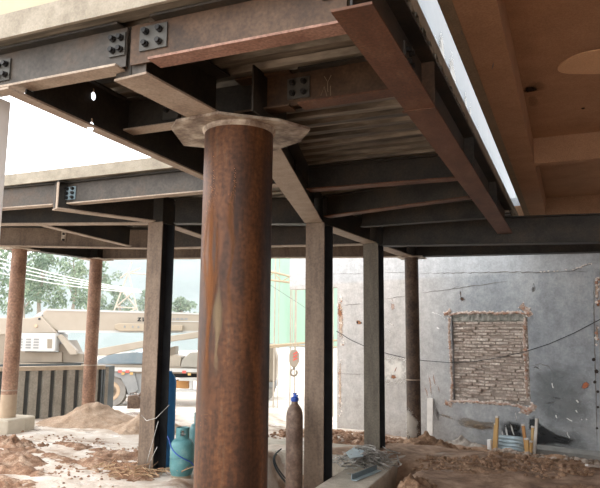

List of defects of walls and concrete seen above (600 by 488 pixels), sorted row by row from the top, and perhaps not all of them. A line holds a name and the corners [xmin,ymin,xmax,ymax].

rust [205,210,217,373]
crack [422,263,592,293]
flaking render [443,302,537,416]